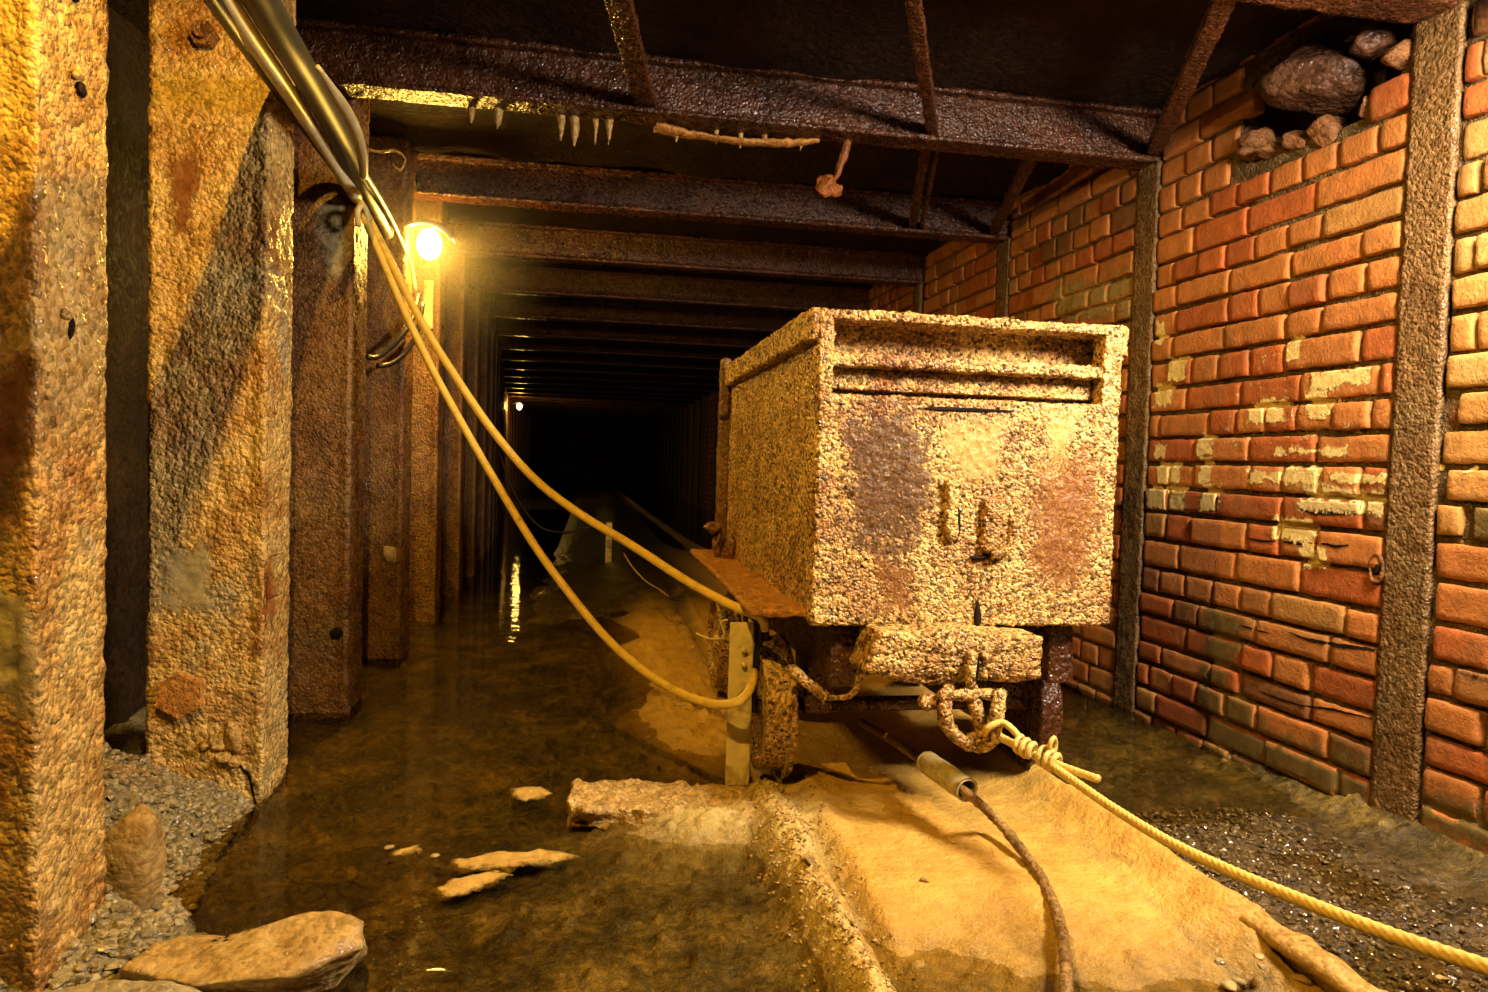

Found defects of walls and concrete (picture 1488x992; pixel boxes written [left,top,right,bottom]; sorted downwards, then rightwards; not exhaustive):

rust [169,153,199,227]
leakage [1152,320,1191,408]
leakage [1146,334,1392,570]